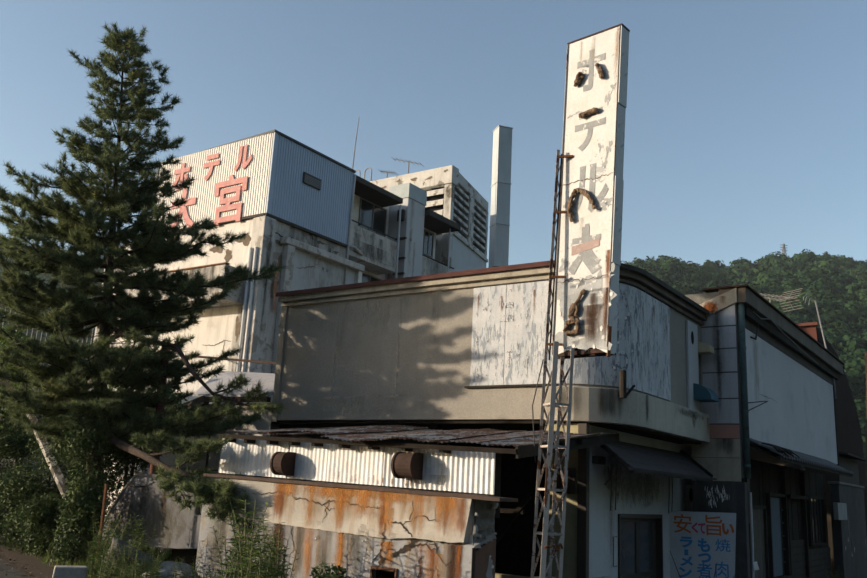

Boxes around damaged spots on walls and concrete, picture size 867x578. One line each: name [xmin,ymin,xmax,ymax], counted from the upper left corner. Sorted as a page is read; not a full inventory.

spalling [209,234,251,262]
rust [275,524,284,559]
crack [323,538,454,578]
rust [419,547,438,578]
rust [448,543,461,578]